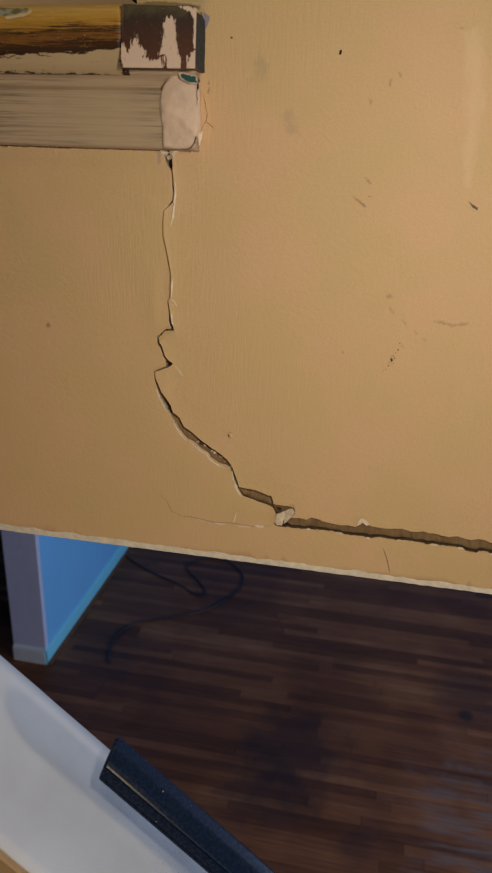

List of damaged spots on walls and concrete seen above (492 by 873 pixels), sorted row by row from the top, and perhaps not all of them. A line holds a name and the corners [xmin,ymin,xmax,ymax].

peeling [0,5,211,75]
crack [154,75,492,573]